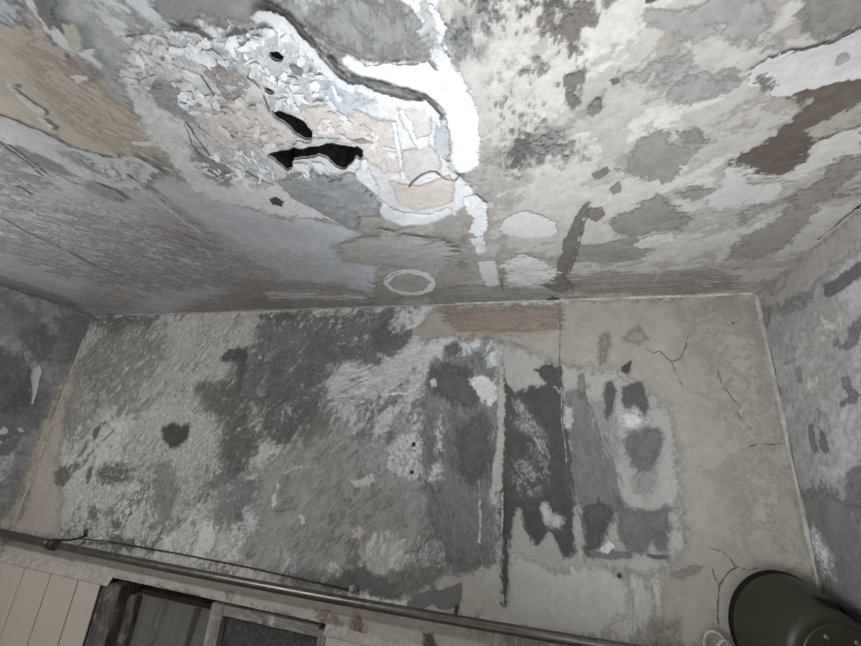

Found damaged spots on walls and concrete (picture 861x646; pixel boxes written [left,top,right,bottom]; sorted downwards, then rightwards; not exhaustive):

spalling [0,0,477,337]
damp [149,0,431,64]
damp [441,0,618,180]
damp [428,127,741,304]
damp [618,0,785,107]
damp [726,155,861,261]
damp [728,79,861,176]
damp [0,278,412,571]
flaking render [0,295,817,646]
damp [268,341,672,614]
crack [646,337,688,385]
damp [800,466,861,615]